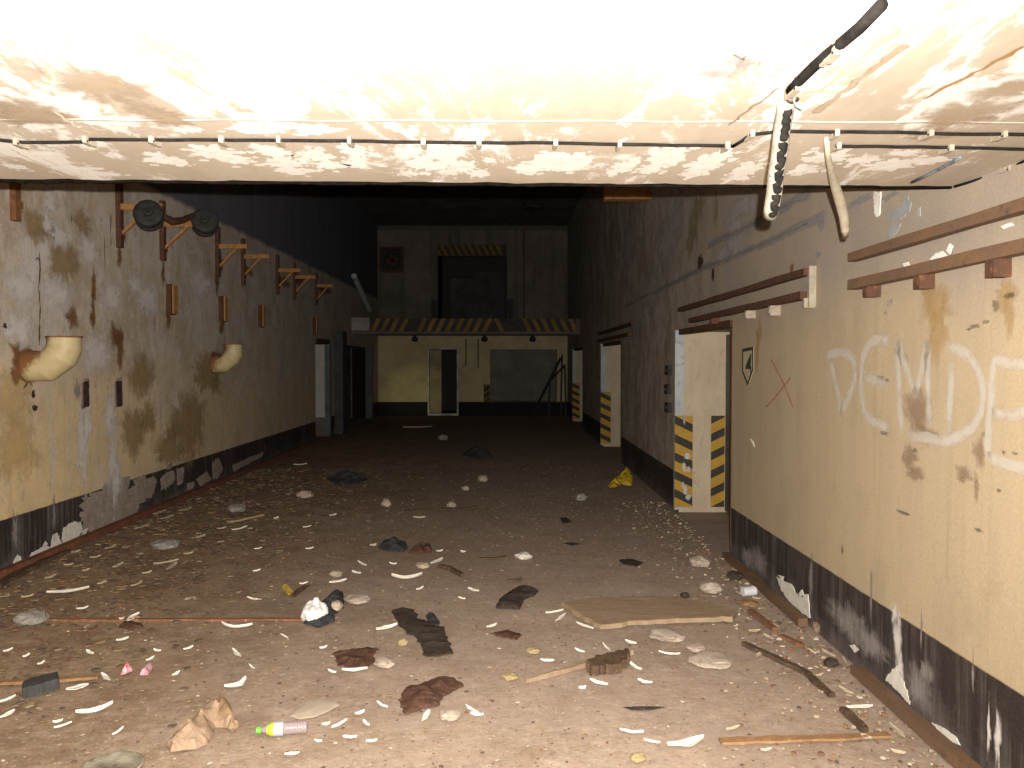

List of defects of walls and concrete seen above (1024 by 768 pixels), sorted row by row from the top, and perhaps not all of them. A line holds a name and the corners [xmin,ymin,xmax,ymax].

peeling [141,123,384,177]
peeling [397,151,594,179]
peeling [603,143,770,182]
peeling [786,147,957,176]
damp [3,188,97,348]
corrosion [11,345,25,384]
damp [83,336,110,374]
damp [159,354,221,462]
damp [77,404,92,483]
damp [105,355,155,521]
peeling [13,452,264,597]
spalling [777,575,811,618]